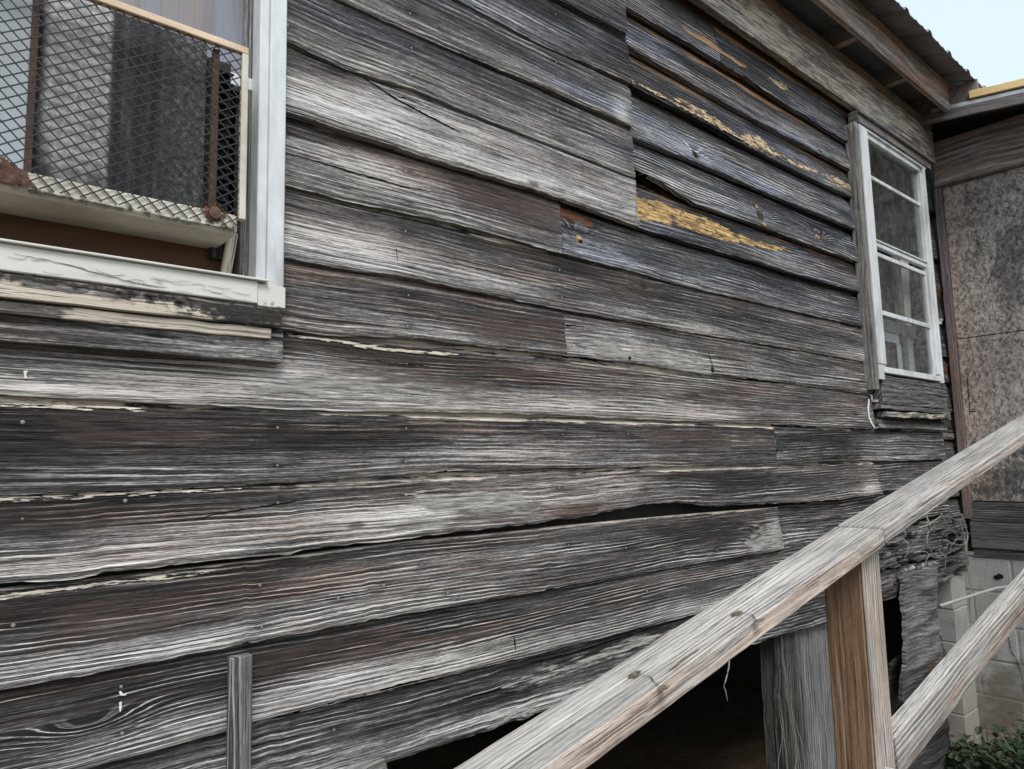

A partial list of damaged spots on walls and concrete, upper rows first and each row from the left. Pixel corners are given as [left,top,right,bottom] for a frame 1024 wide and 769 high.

crack [359,75,460,132]
peeling [631,79,748,143]
corrosion [0,154,35,190]
crack [197,498,309,518]